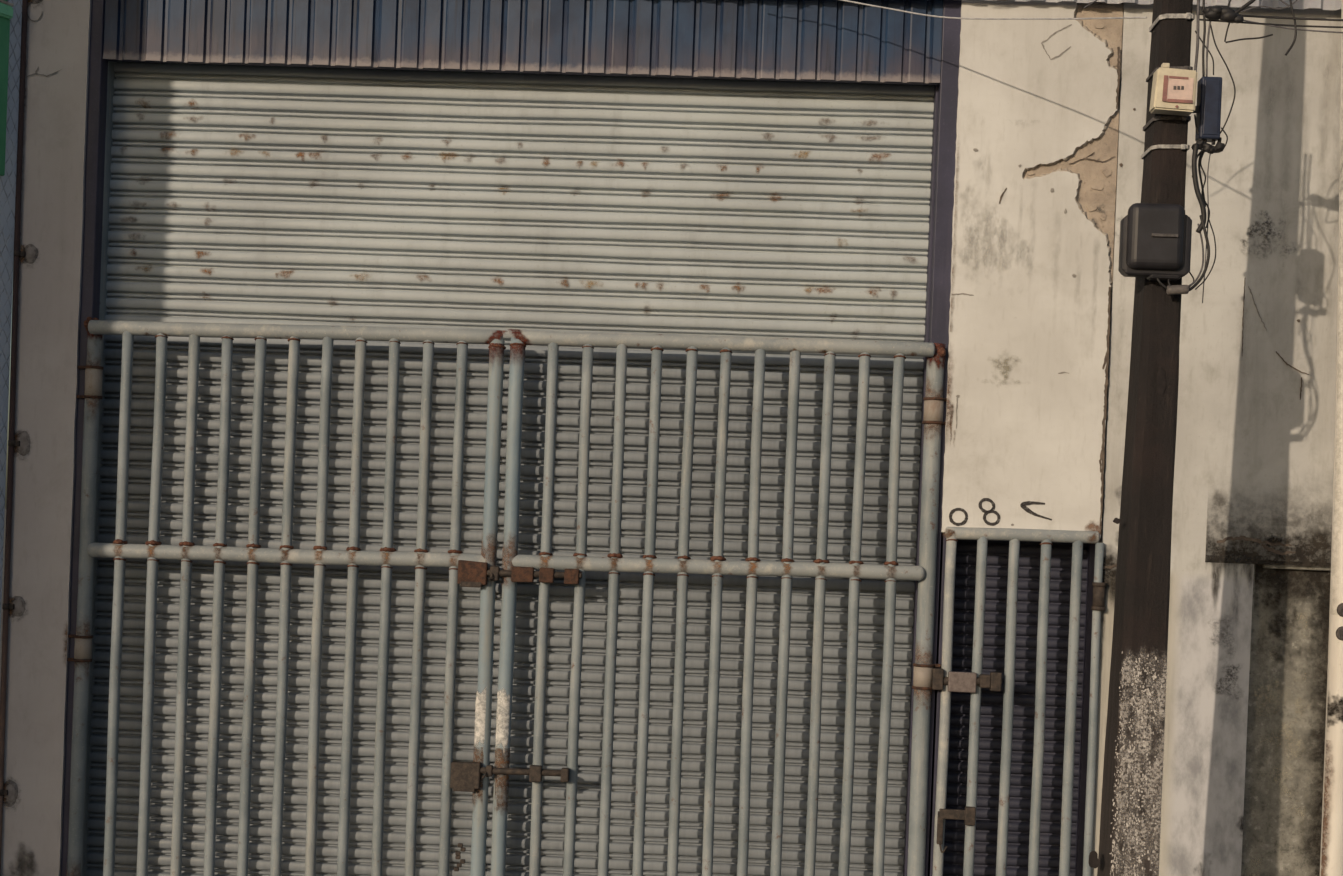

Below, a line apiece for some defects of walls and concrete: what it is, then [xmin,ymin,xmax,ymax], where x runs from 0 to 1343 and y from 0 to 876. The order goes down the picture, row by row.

spalling [1074,5,1124,79]
spalling [1018,108,1136,290]
damp [1102,555,1117,637]
damp [1205,517,1332,876]